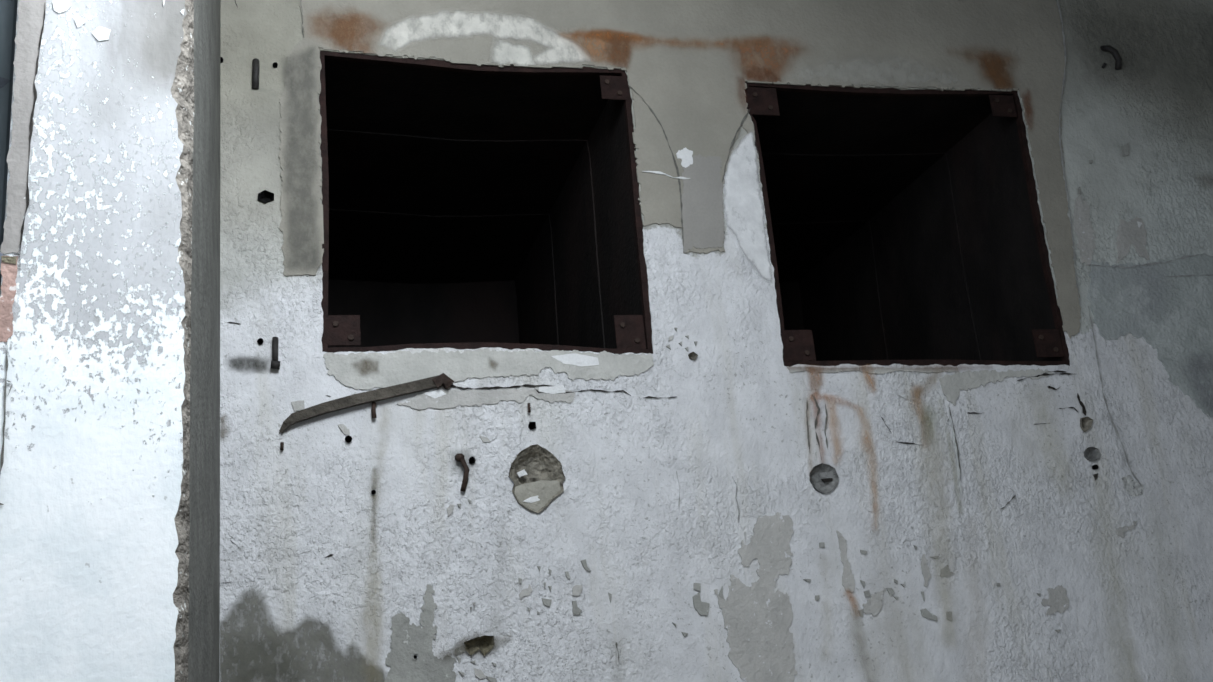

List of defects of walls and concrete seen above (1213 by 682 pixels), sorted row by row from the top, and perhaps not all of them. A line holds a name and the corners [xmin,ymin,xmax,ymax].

corrosion [571,31,649,65]
peeling [0,0,111,342]
peeling [1087,216,1213,418]
water stain [220,590,385,682]
peeling [693,512,797,682]
peeling [819,531,905,617]